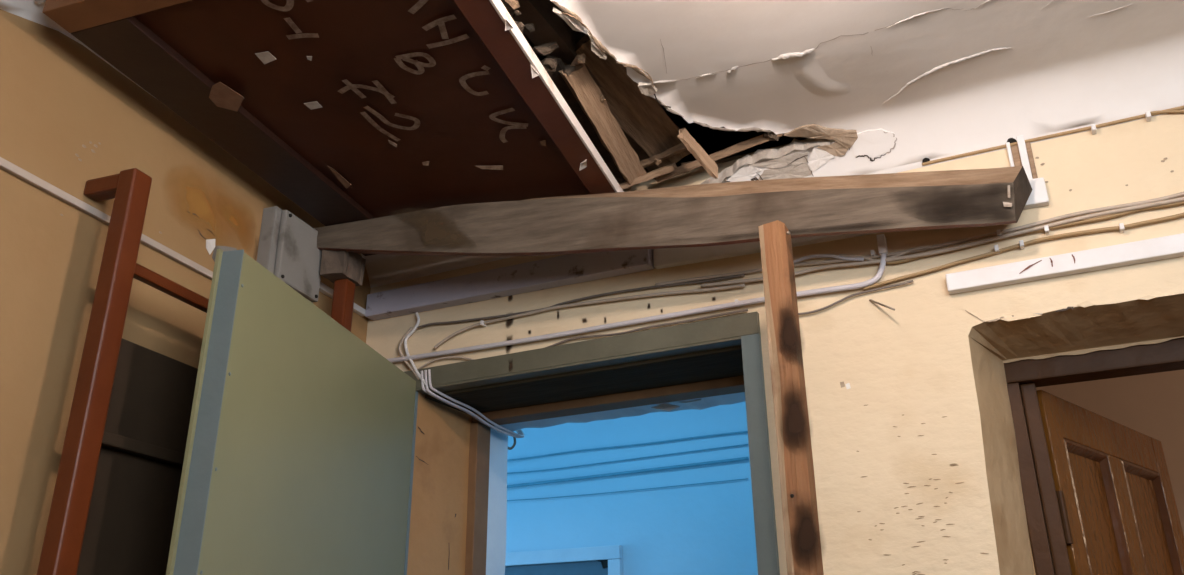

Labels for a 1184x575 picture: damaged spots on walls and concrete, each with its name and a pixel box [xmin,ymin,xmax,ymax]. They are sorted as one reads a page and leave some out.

flaking render [553,7,607,59]
flaking render [638,82,658,96]
flaking render [726,124,897,182]